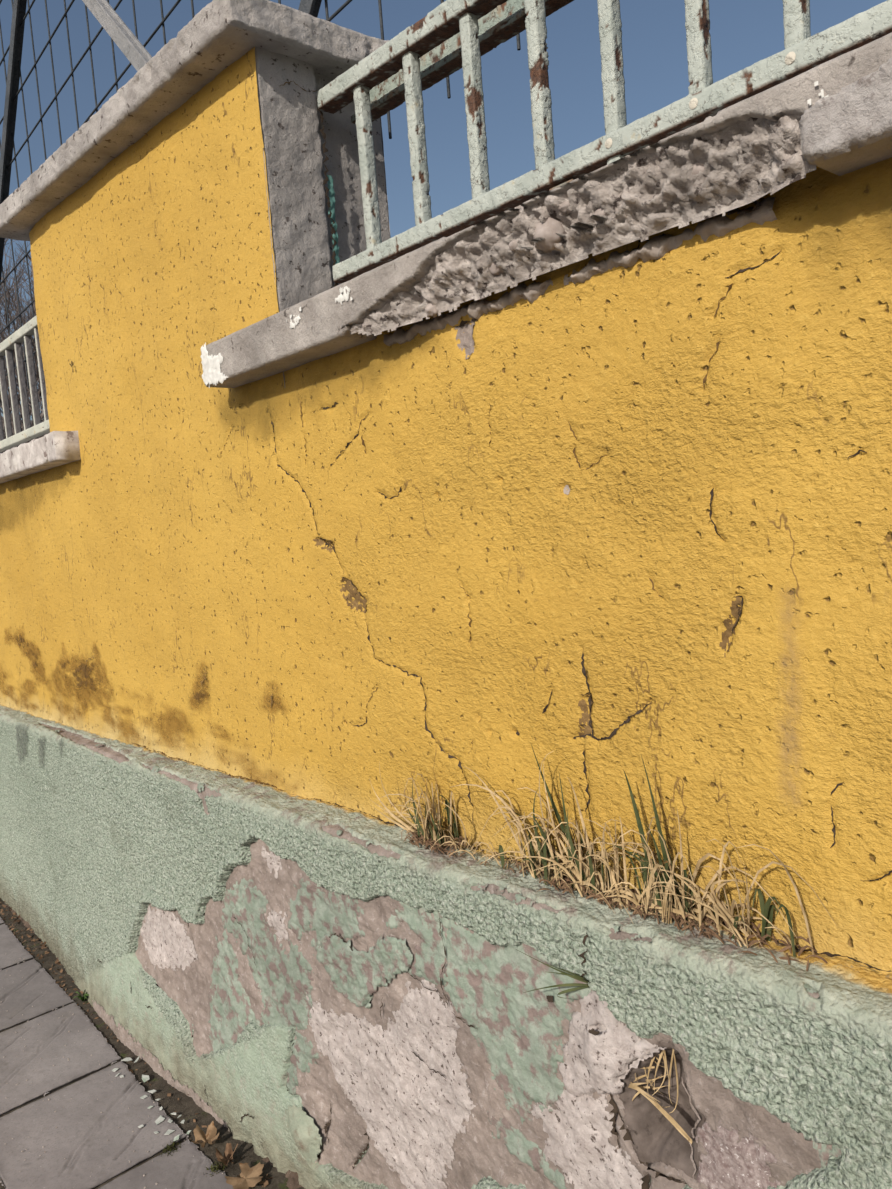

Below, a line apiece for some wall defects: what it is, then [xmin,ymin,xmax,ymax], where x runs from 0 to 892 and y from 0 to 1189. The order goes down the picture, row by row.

spalling [350,81,828,359]
crack [267,397,369,574]
water stain [15,725,45,762]
water stain [0,631,138,738]
water stain [156,669,208,744]
water stain [265,694,283,711]
crack [354,616,524,863]
crack [573,649,652,812]
spalling [322,824,401,859]
crack [695,914,891,972]
peeling [92,1000,230,1131]
peeling [135,839,841,1189]